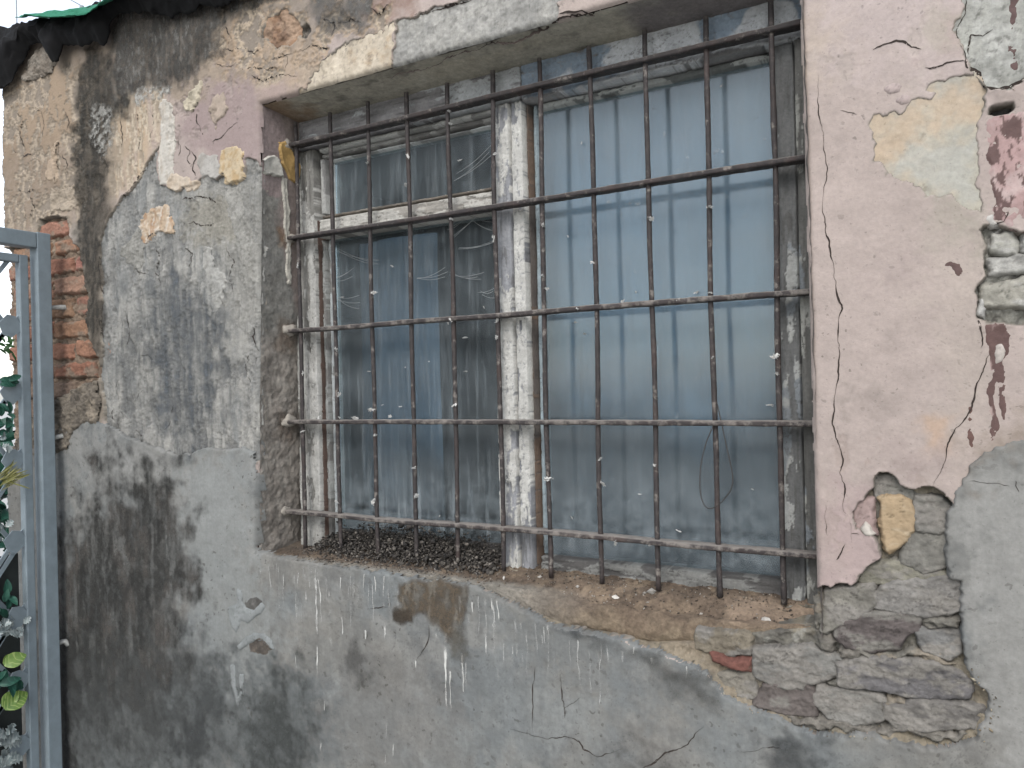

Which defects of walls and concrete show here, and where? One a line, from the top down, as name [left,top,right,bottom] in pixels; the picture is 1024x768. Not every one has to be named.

leakage [70,0,264,354]
peeling [40,80,301,461]
leakage [122,268,221,435]
peeling [217,0,561,94]
crack [817,78,857,559]
crack [873,39,964,69]
peeling [869,0,1024,441]
crack [932,320,990,488]
leakage [57,454,235,768]
leakage [384,576,499,704]
crack [513,672,618,757]
spalling [586,472,1001,746]